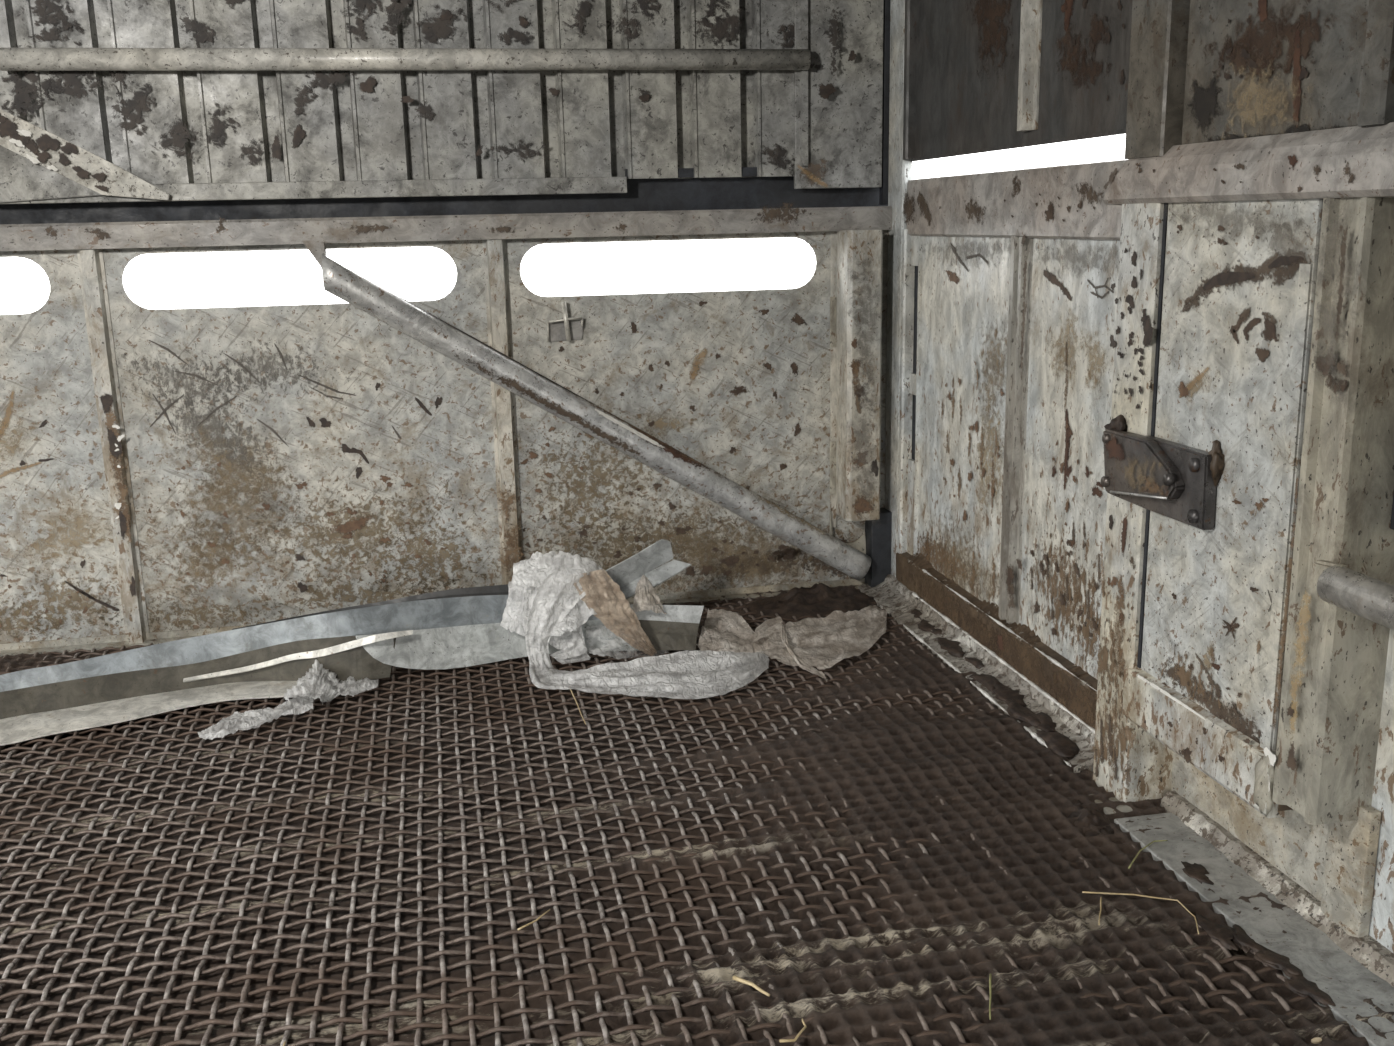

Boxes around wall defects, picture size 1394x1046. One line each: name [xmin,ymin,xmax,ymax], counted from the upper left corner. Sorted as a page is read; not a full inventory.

rust [22,0,83,48]
rust [179,12,215,48]
rust [339,0,533,45]
rust [562,0,593,37]
rust [606,0,661,41]
rust [683,0,747,49]
rust [1,70,377,166]
rust [475,140,550,160]
rust [1051,318,1105,560]
rust [100,394,132,543]
rust [130,299,814,632]
rust [901,329,1097,728]